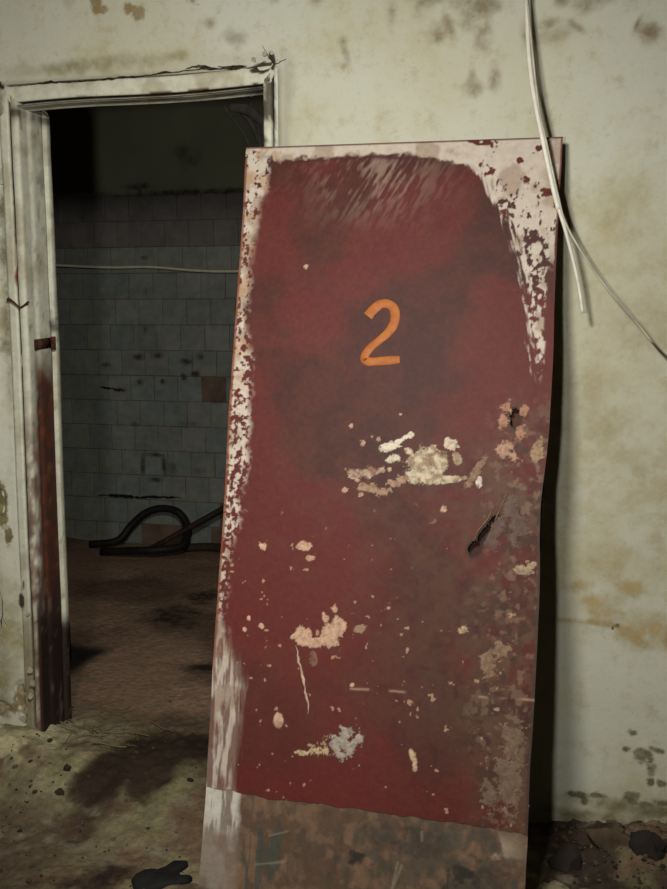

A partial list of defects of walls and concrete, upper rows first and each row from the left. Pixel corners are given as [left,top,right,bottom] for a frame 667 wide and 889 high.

crack [22,45,287,86]
spalling [0,484,13,543]
water stain [638,748,665,786]
water stain [564,791,603,822]